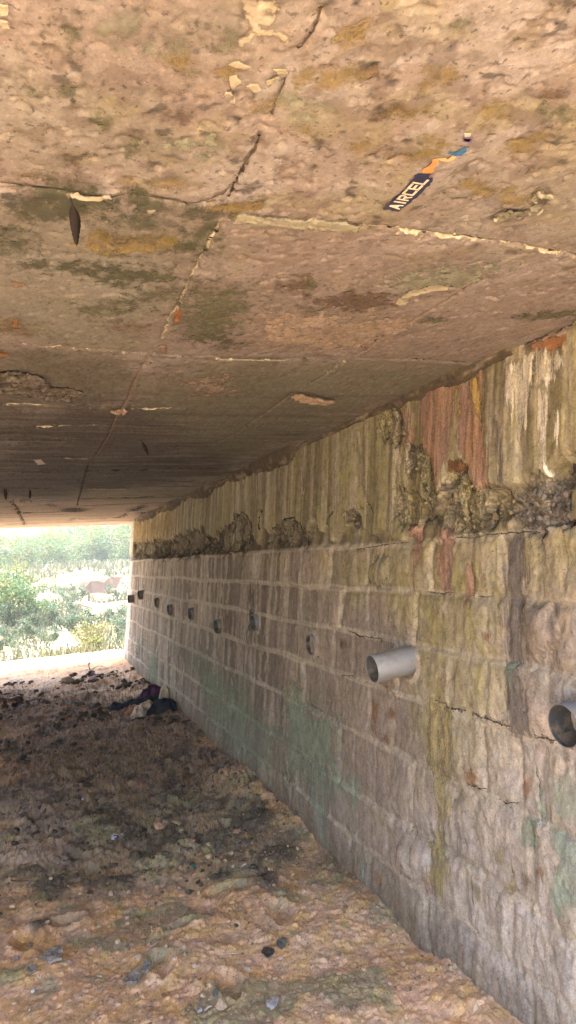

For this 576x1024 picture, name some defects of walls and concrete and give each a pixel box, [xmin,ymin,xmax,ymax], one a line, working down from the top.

flaking render [238,0,288,47]
crack [297,5,325,49]
flaking render [224,61,288,104]
crack [0,77,287,525]
spalling [291,394,335,406]
corrosion [398,370,490,492]
water stain [503,348,565,478]
water stain [495,421,509,489]
crack [435,699,509,727]